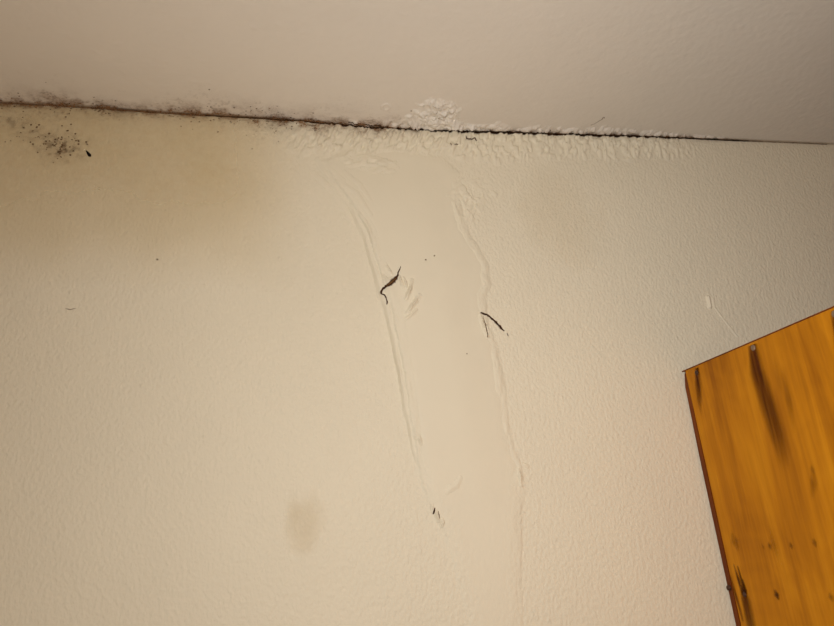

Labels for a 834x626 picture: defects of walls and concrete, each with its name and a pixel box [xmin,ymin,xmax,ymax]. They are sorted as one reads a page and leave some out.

damp [0,93,392,167]
crack [58,106,827,149]
crack [380,266,401,304]
crack [480,312,508,337]